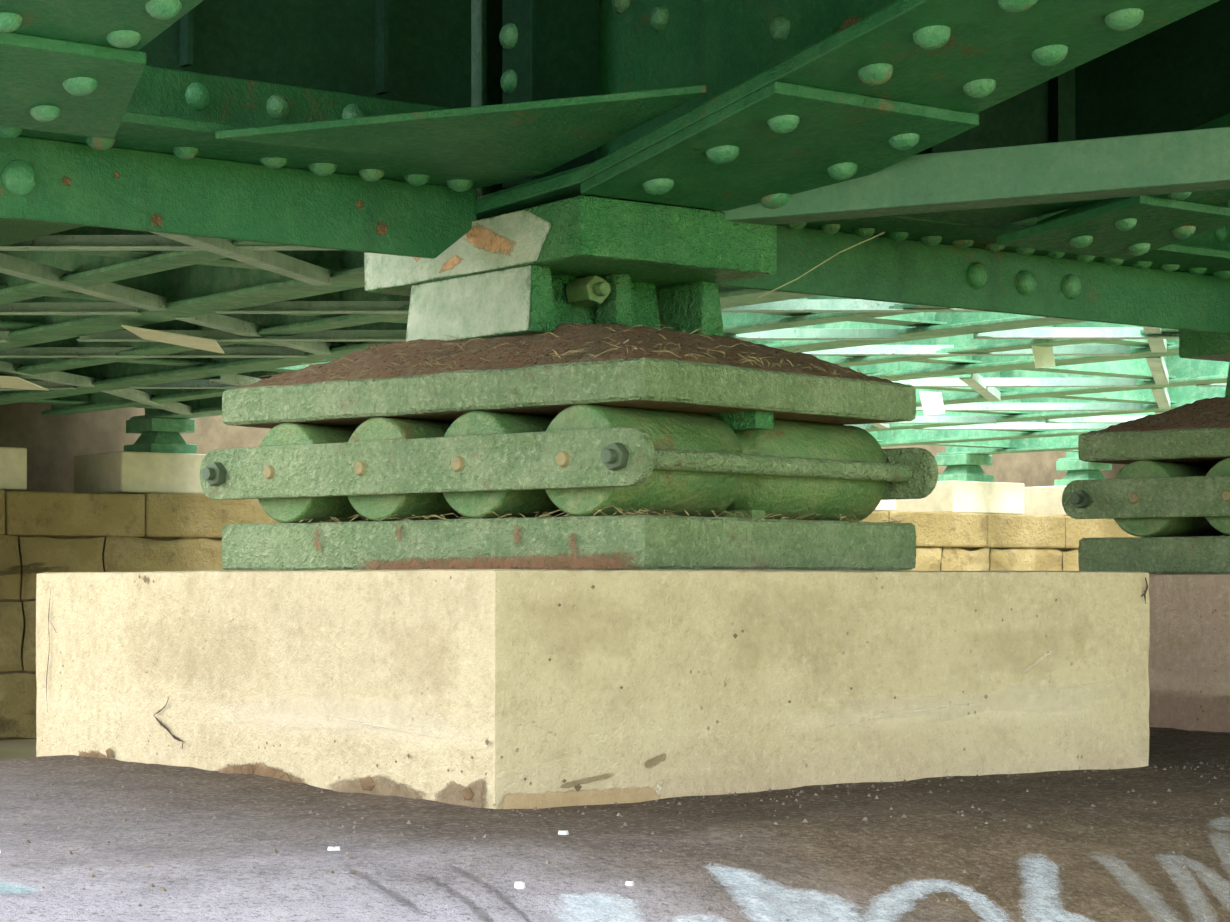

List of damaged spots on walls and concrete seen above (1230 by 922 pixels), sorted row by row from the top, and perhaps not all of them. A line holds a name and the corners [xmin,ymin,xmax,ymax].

peeling [364,210,551,341]
rust [363,525,631,570]
crack [153,697,183,749]